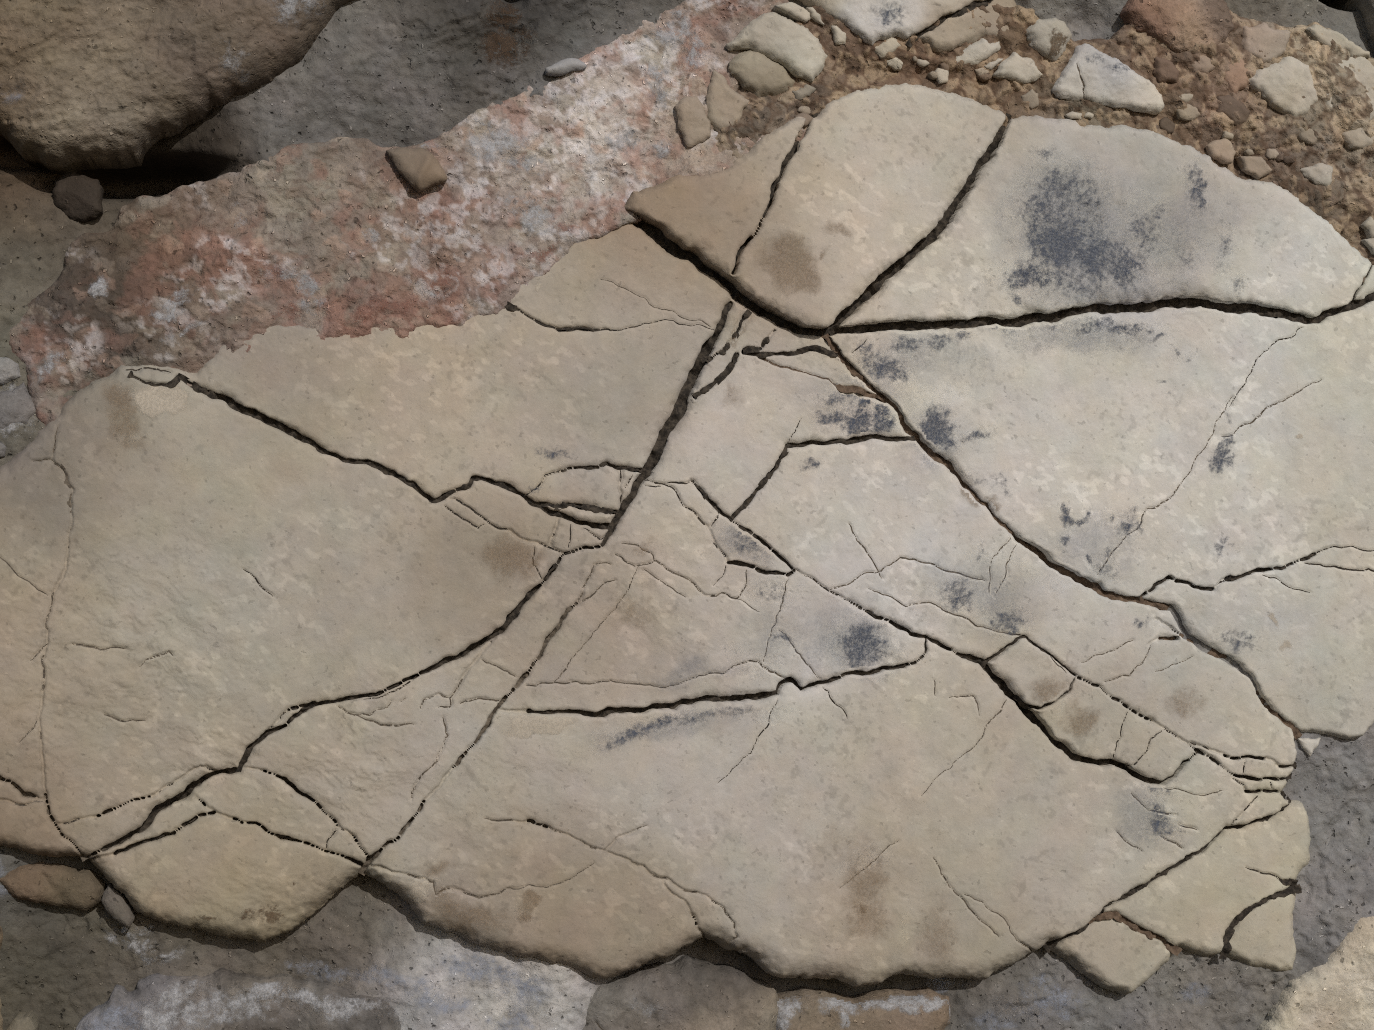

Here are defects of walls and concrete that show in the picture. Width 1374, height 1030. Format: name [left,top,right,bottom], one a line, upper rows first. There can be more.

crack [624,83,1006,330]
crack [826,113,1374,336]
crack [0,220,1374,995]